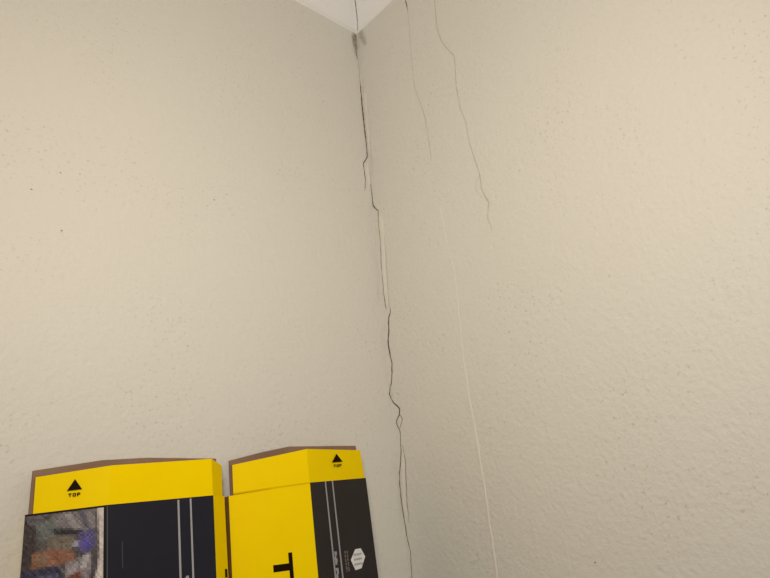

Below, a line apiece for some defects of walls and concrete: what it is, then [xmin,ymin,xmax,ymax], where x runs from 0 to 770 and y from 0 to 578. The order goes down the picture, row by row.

crack [356,54,412,574]
crack [434,0,492,231]